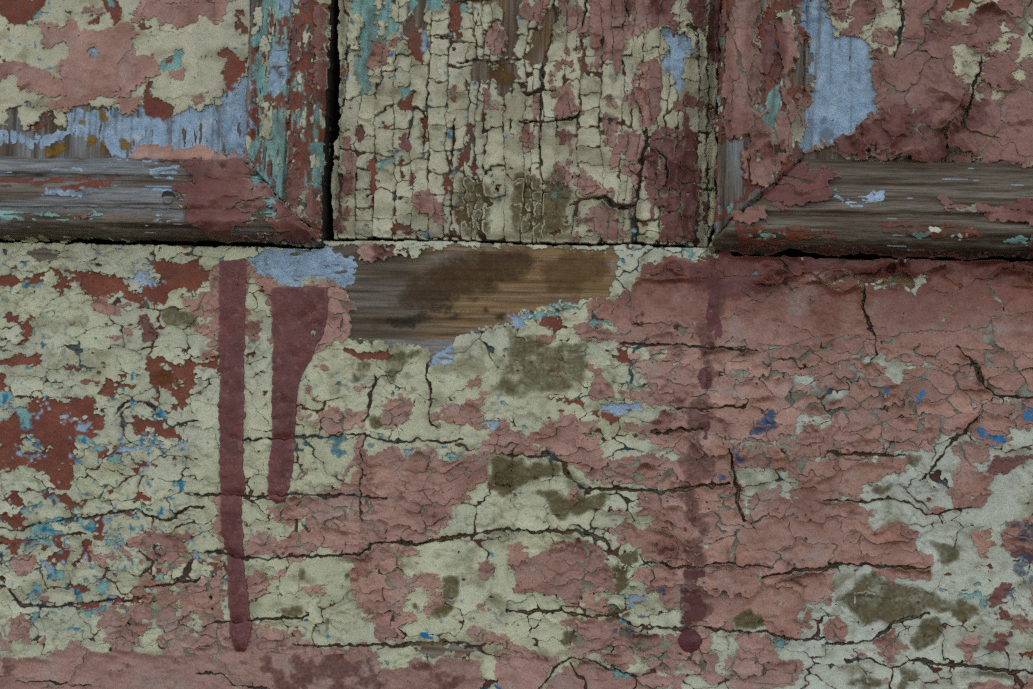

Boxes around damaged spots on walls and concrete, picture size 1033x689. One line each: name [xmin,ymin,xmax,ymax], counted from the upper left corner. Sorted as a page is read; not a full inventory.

peeling [0,0,332,159]
peeling [719,0,842,212]
peeling [126,93,326,247]
peeling [730,205,770,226]
peeling [937,194,1033,227]
peeling [928,226,968,241]
peeling [20,434,53,458]